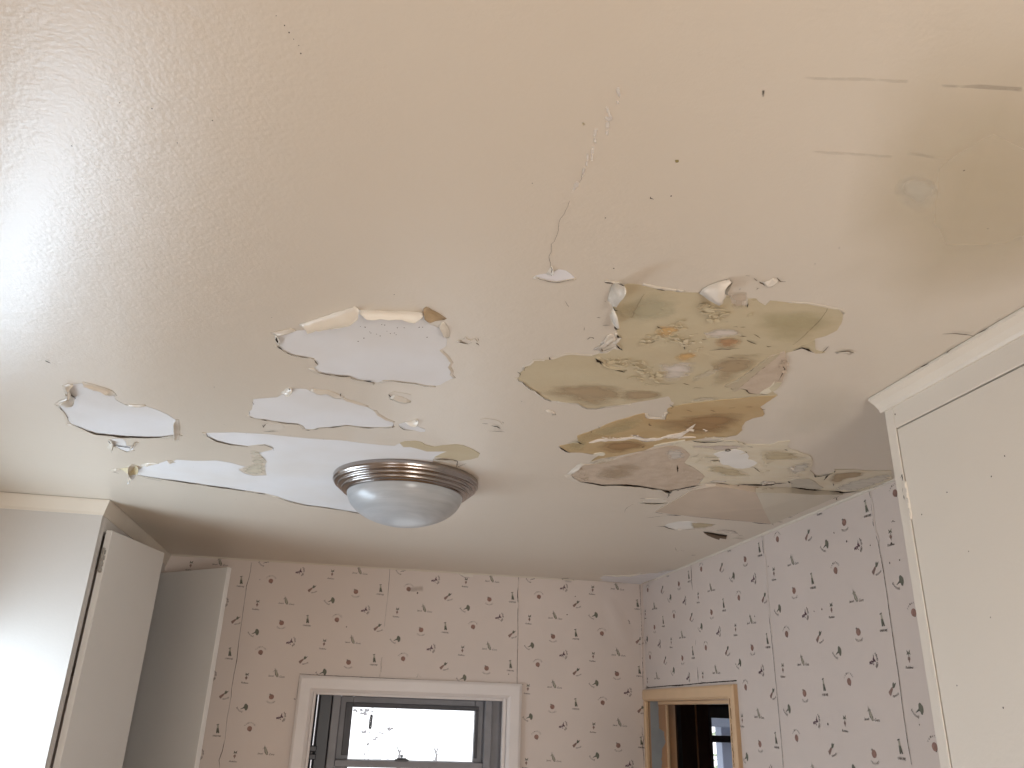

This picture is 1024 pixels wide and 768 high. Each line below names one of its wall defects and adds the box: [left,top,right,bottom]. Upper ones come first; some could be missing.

peeling [532,266,576,284]
peeling [54,382,182,453]
peeling [109,387,480,514]
peeling [271,306,455,404]
peeling [514,279,904,505]
peeling [660,521,744,540]